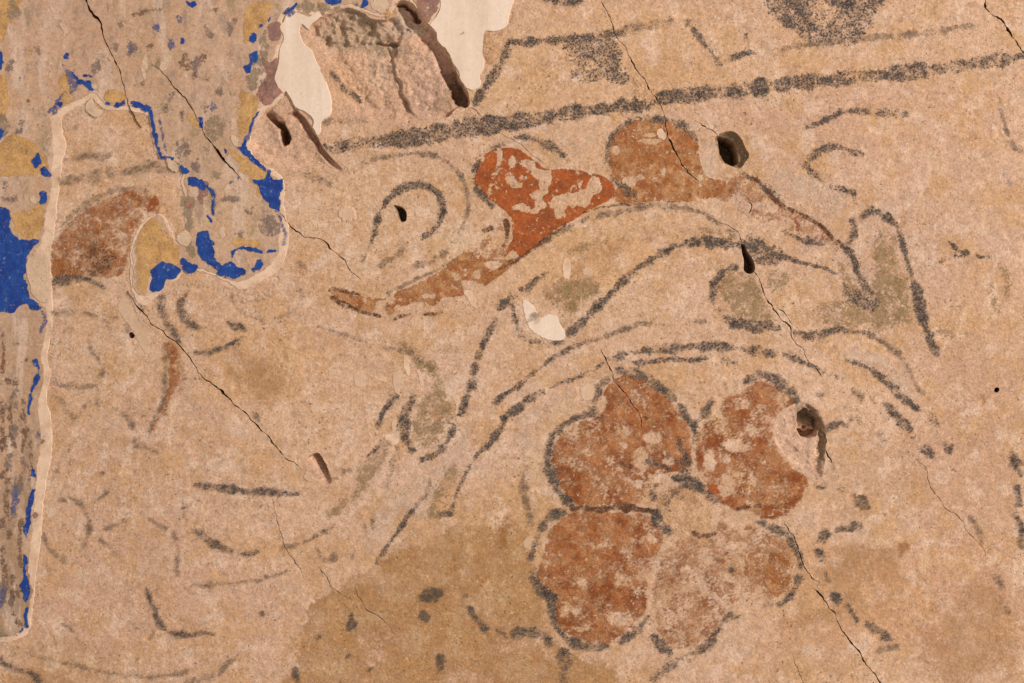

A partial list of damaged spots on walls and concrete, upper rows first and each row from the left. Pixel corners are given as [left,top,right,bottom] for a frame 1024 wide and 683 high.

crack [85,0,139,124]
crack [158,68,242,180]
crack [601,0,702,184]
crack [984,0,1024,53]
crack [126,292,298,466]
peeling [0,0,486,644]
peeling [522,299,565,341]
spalling [774,401,826,481]
crack [784,522,881,683]